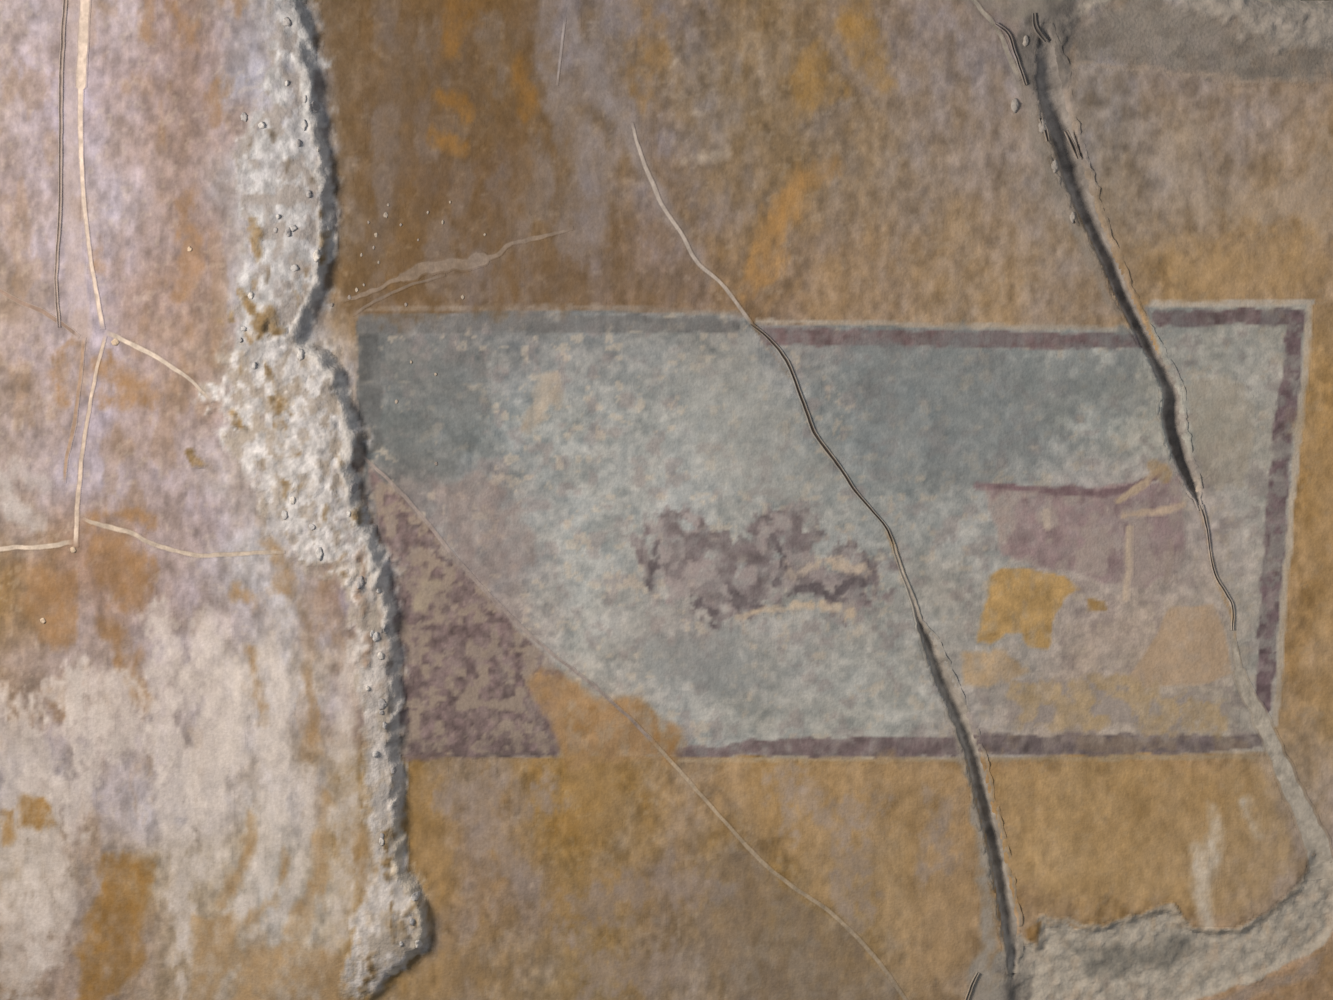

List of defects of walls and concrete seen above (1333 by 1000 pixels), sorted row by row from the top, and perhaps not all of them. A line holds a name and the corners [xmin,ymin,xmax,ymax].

crack [0,288,285,559]
leakage [0,0,718,1000]
crack [357,452,908,1000]
leakage [679,147,734,168]
crack [559,0,1037,1000]
crack [940,0,1333,881]